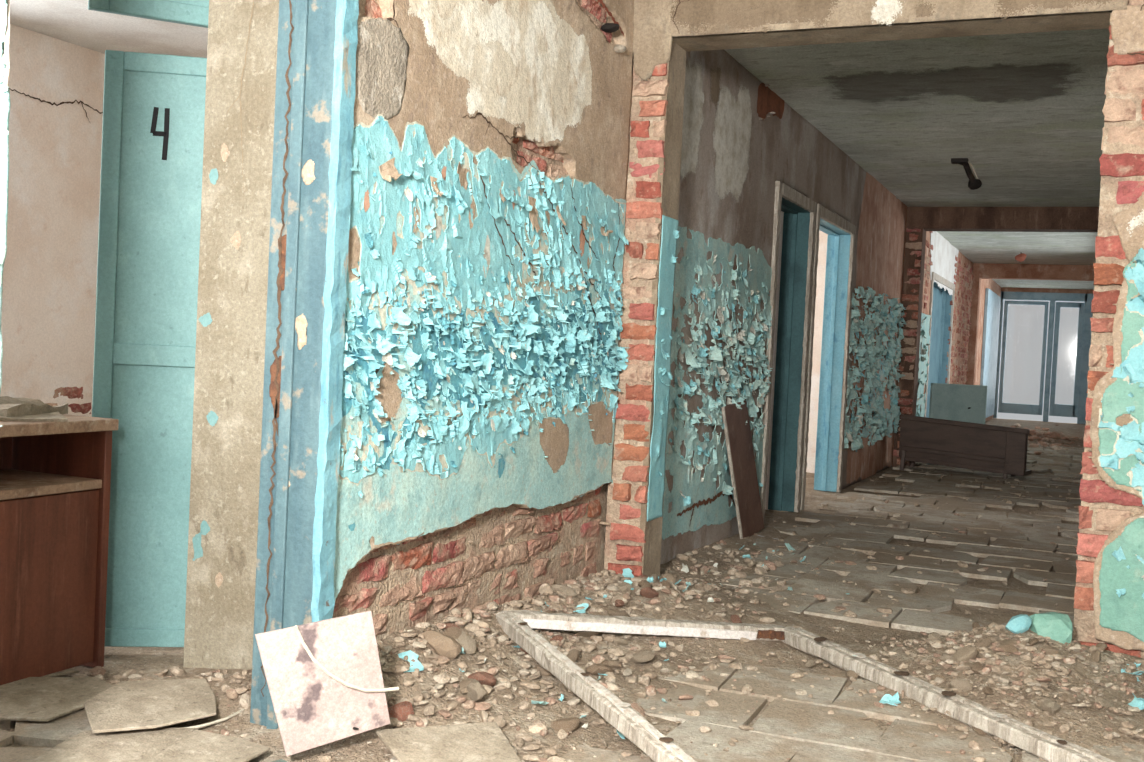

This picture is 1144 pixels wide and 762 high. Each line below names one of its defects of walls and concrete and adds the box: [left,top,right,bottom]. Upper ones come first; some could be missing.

peeling [0,0,10,393]
damp [680,59,752,203]
damp [670,0,841,36]
damp [870,0,939,26]
damp [821,60,1086,107]
damp [991,0,1114,20]
flaking render [1099,25,1144,204]
flaking render [45,387,91,414]
peeling [295,314,308,350]
peeling [333,0,774,636]
peeling [844,228,933,465]
peeling [1074,235,1144,658]